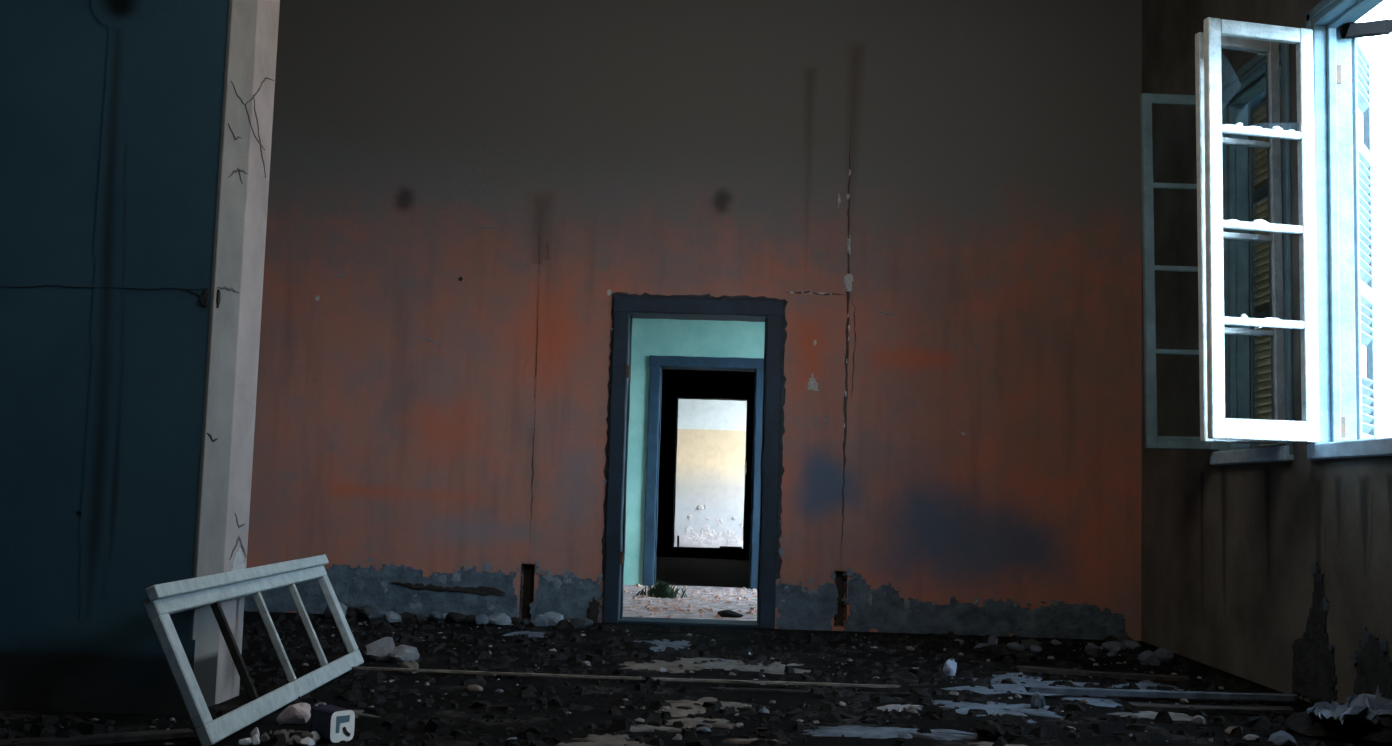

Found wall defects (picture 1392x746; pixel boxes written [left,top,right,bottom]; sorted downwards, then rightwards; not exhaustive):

crack [228,77,274,184]
rust [489,260,612,428]
rust [782,306,838,451]
crack [784,124,856,547]